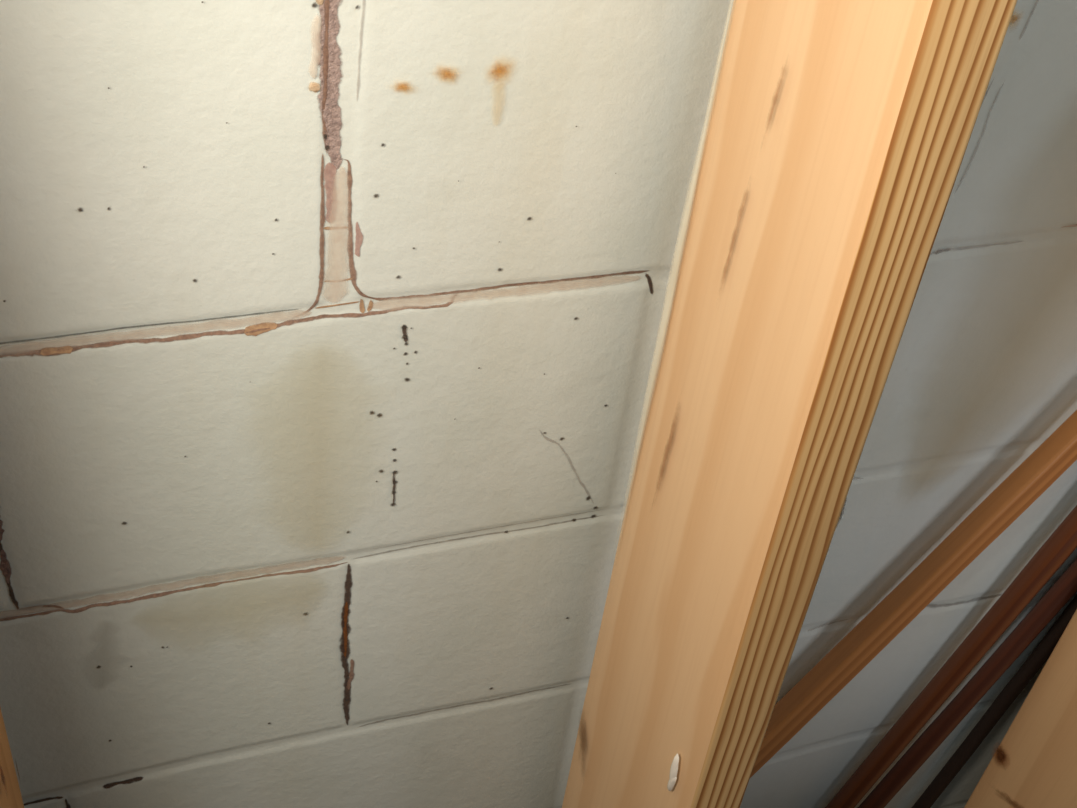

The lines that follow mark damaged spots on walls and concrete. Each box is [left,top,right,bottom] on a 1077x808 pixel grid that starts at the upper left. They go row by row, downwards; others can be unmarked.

crack [0,0,653,381]
crack [376,448,397,506]
crack [0,520,354,725]
crack [24,796,71,808]